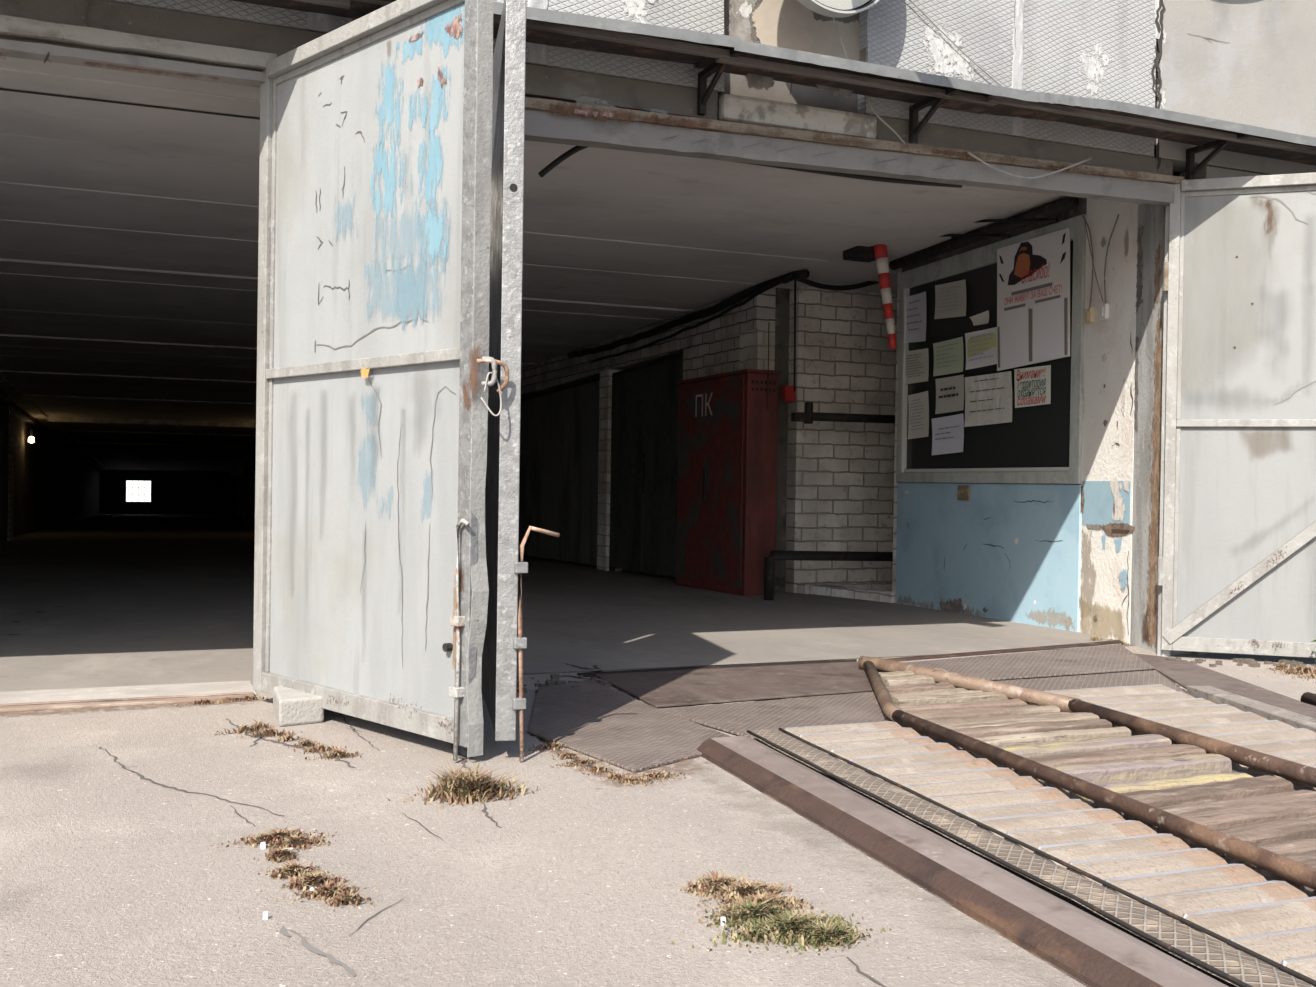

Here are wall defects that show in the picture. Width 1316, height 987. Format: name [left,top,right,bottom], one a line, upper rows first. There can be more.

peeling [727,0,860,61]
peeling [370,3,465,262]
rust [549,105,707,128]
spalling [745,73,774,90]
crack [1151,0,1229,169]
peeling [1029,478,1135,640]
crack [99,747,284,826]